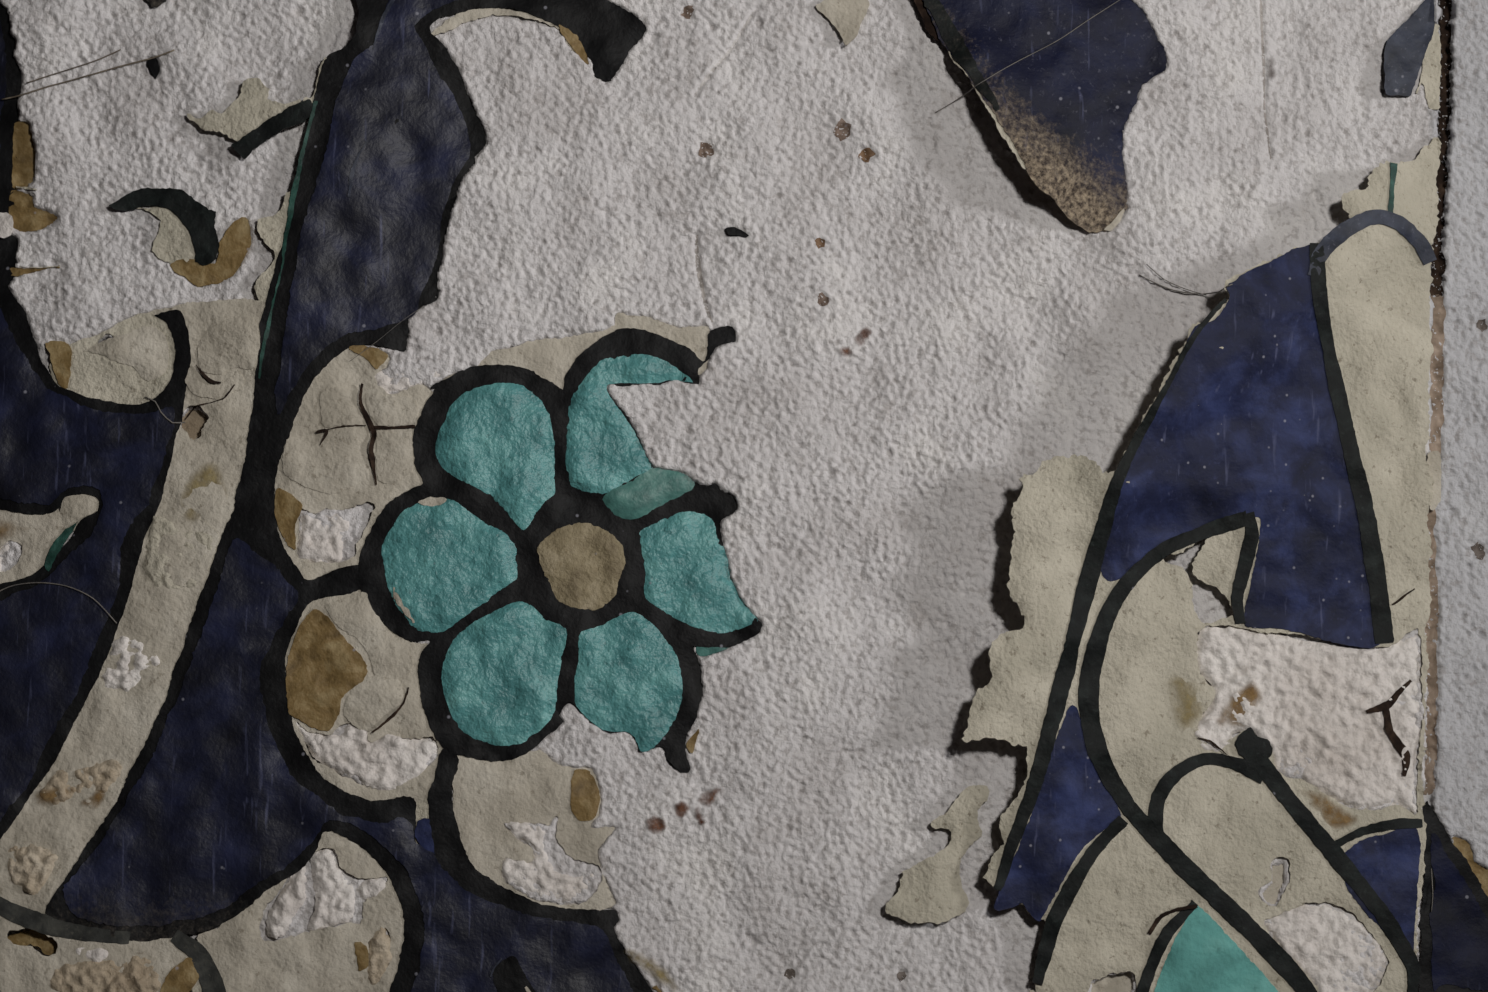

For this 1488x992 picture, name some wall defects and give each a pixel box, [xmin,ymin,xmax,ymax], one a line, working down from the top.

spalling [817,292,829,306]
spalling [833,118,851,141]
spalling [858,148,875,162]
peeling [914,0,1167,233]
crack [1429,0,1452,455]
peeling [0,0,762,992]
peeling [885,137,1488,992]
crack [1366,509,1439,795]